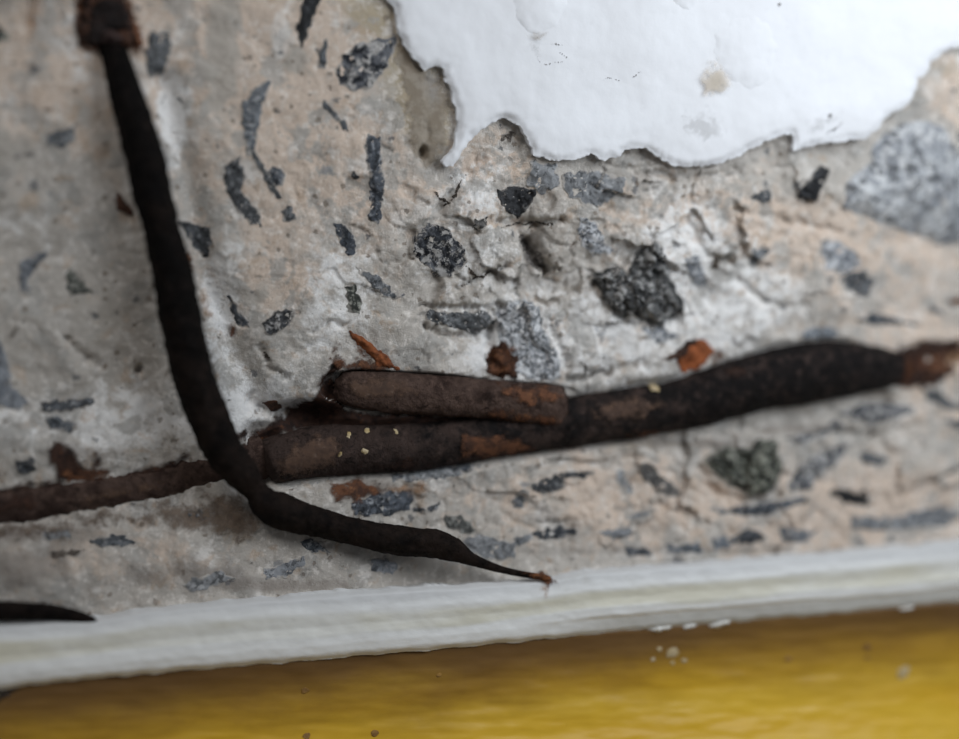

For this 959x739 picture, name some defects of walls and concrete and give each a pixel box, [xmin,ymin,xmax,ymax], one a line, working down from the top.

rust [74,0,148,53]
rust [115,192,133,216]
spalling [0,0,207,490]
spalling [124,0,959,575]
rust [237,331,461,480]
rust [486,341,563,424]
rust [594,397,659,420]
rust [663,338,723,374]
rust [897,337,959,390]
rust [0,442,110,493]
rust [331,477,380,503]
spalling [0,480,526,615]